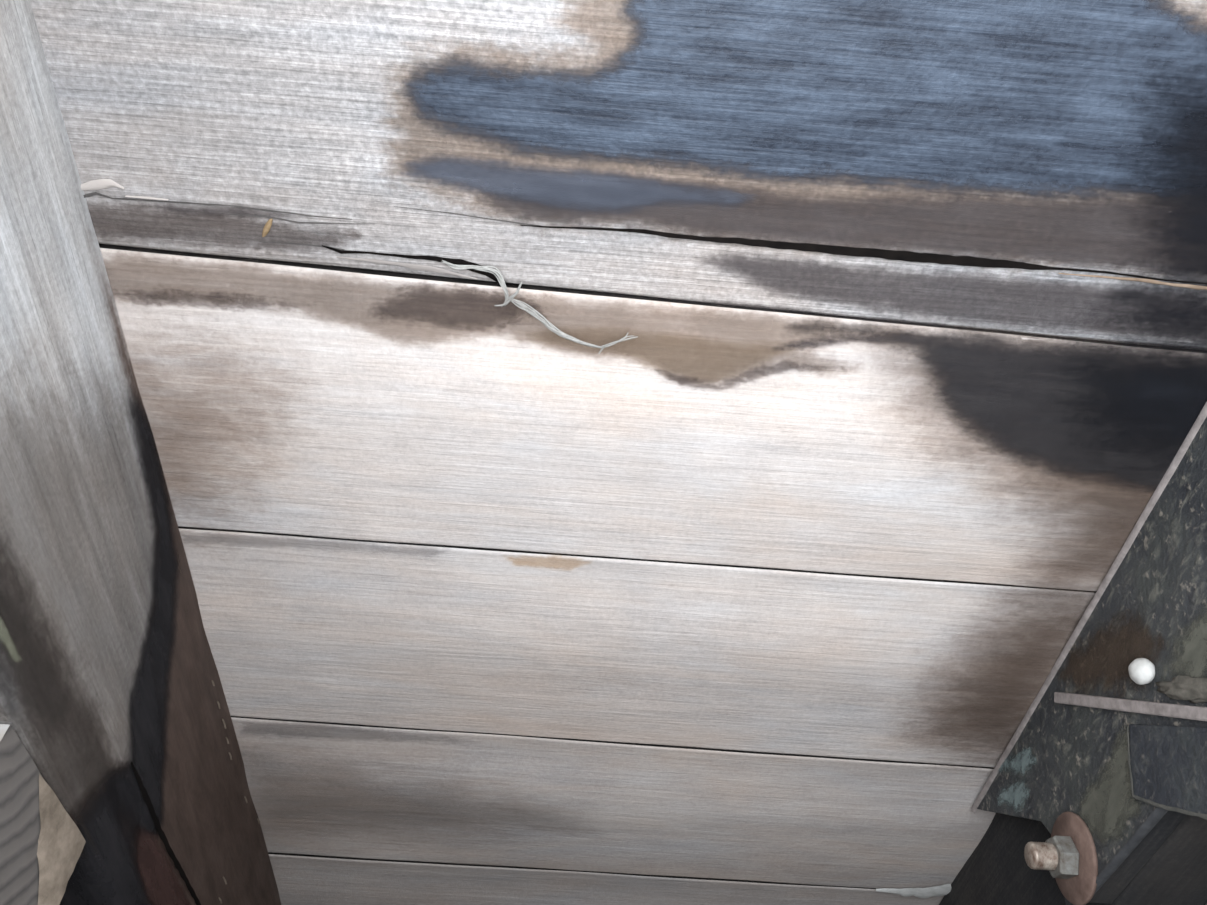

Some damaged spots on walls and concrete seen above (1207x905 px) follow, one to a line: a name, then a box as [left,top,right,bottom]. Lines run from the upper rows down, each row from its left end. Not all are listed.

leakage [409,0,1207,242]
crack [83,192,527,289]
crack [394,206,1207,290]
leakage [926,340,1207,547]
leakage [38,404,281,905]